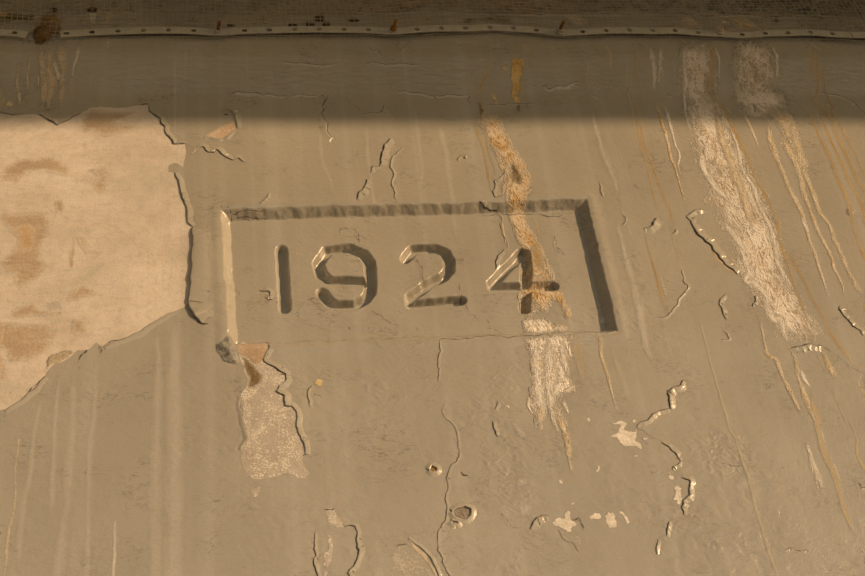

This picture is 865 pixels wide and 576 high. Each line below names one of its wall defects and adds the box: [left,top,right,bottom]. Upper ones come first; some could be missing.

rust [0,11,64,45]
peeling [0,101,214,413]
peeling [216,334,311,497]
crack [356,138,404,200]
rust [474,41,572,319]
water stain [521,317,588,474]
crack [635,380,696,554]
water stain [647,39,865,369]
crack [791,343,865,379]
crack [838,306,865,335]
crack [344,521,366,576]
peeling [387,536,442,576]